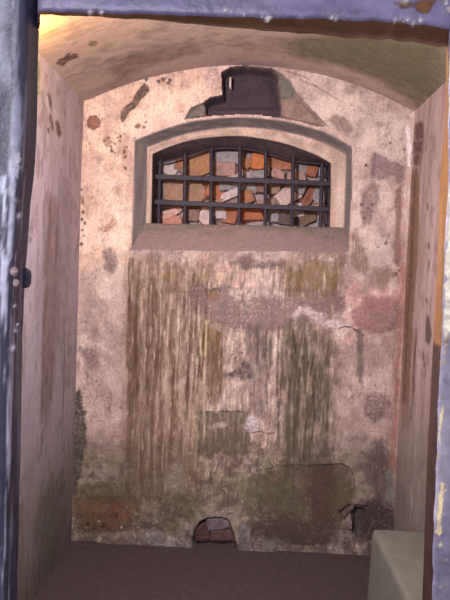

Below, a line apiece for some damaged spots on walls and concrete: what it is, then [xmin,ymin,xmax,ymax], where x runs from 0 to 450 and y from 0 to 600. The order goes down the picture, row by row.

spalling [185,65,355,180]
water stain [350,235,394,271]
water stain [100,249,349,493]
spalling [190,516,238,550]